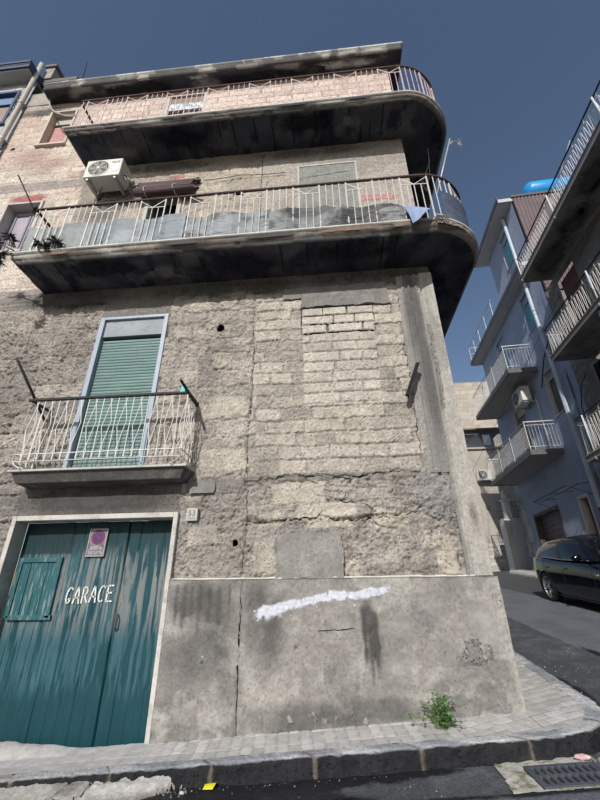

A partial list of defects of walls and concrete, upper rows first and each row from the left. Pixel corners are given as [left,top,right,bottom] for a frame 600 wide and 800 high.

damp [103,143,139,160]
damp [130,162,209,172]
damp [70,261,135,276]
damp [156,254,294,296]
damp [25,292,119,309]
crack [301,304,376,334]
crack [235,309,423,711]
damp [362,606,407,680]